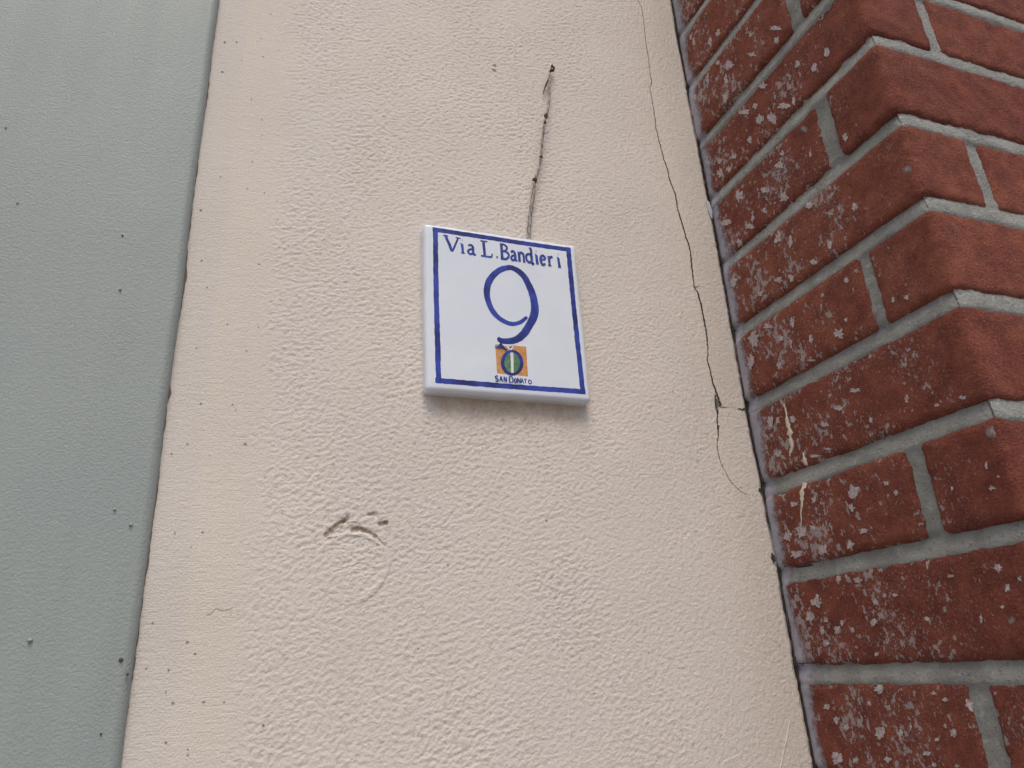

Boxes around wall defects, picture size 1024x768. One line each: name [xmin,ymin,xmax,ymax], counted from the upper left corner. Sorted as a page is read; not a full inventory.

crack [641,1,819,768]
leakage [783,404,808,466]
flaking render [325,517,388,544]